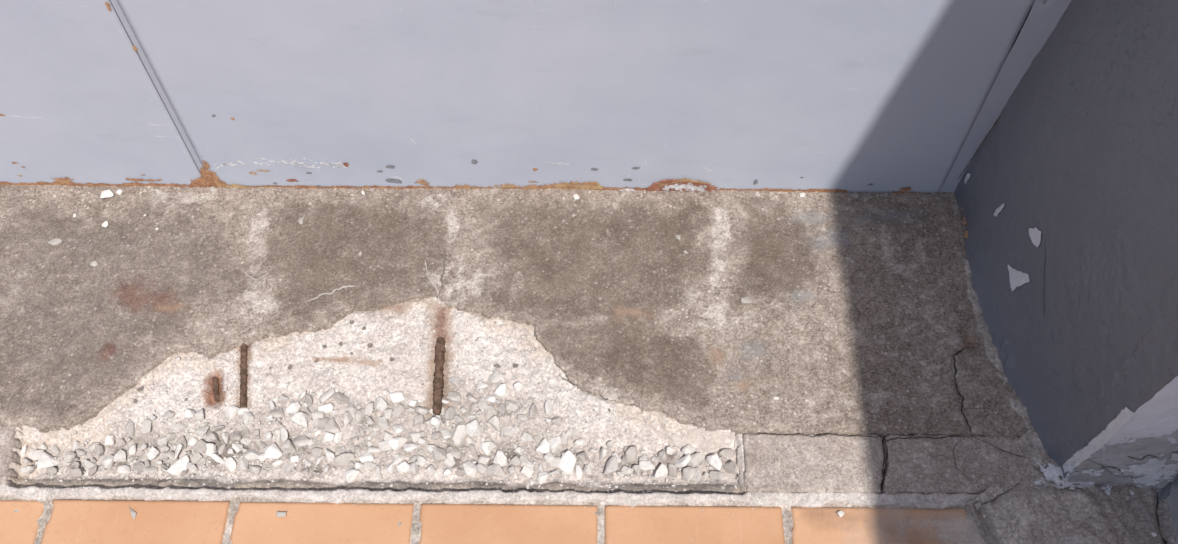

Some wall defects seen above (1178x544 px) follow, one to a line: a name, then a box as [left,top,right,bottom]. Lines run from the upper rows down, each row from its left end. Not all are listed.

corrosion [0,160,647,191]
water stain [266,205,446,316]
water stain [482,200,713,409]
peeling [1008,264,1030,291]
peeling [1029,227,1041,248]
corrosion [202,373,224,405]
spalling [7,297,747,495]
corrosion [426,305,452,413]
crack [747,346,1026,505]
peeling [1063,407,1178,493]
crack [1100,453,1178,475]
crack [1156,493,1167,544]